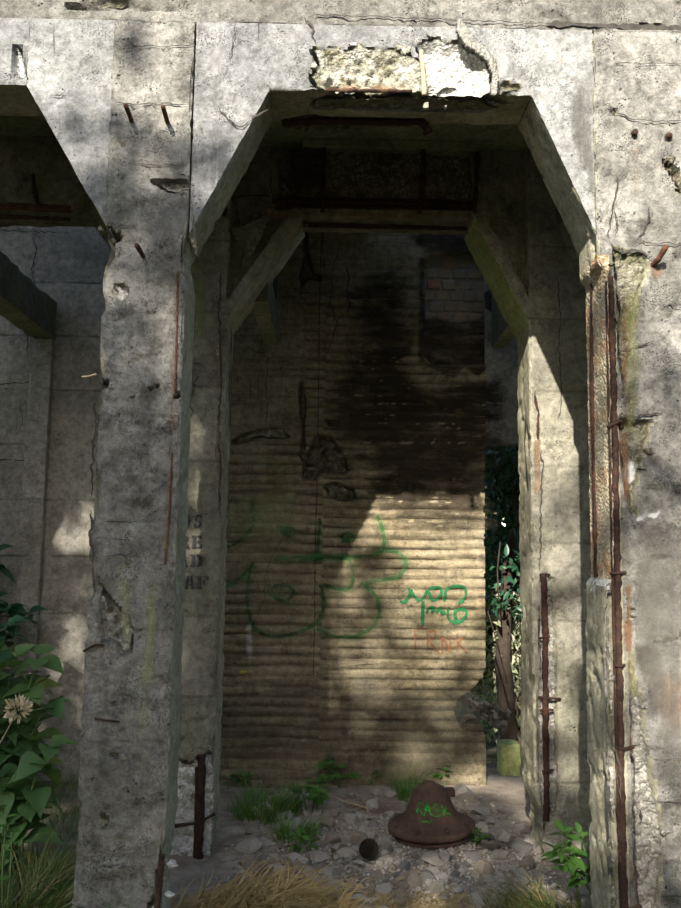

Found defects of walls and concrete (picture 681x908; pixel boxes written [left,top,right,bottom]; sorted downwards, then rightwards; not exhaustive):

spalling [310,18,520,111]
spalling [662,157,681,192]
flaking render [421,255,484,366]
spalling [151,754,215,908]